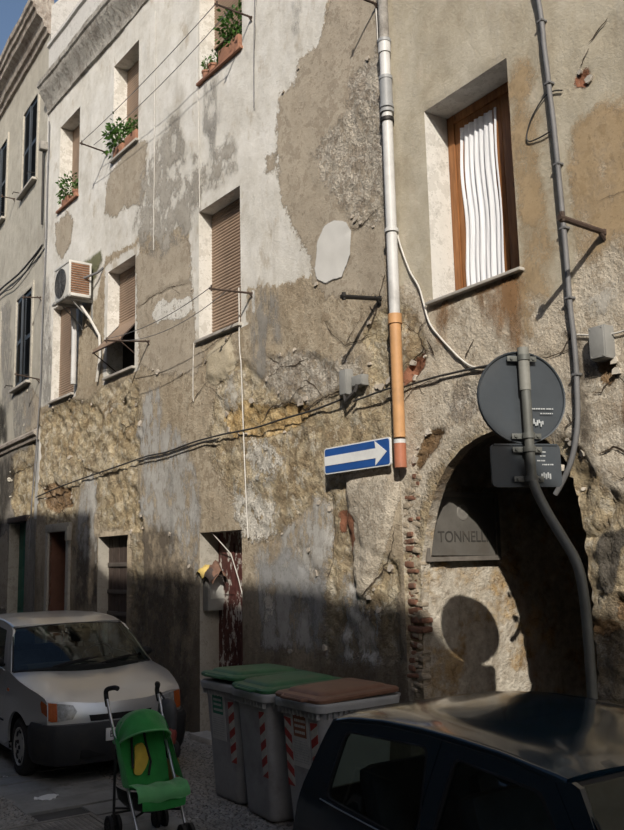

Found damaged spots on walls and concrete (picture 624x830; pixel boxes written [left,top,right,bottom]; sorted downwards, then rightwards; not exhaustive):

flaking render [104,140,148,218]
flaking render [224,0,391,439]
crack [326,274,385,346]
crack [260,356,340,423]
flaking render [403,353,427,385]
peeling [7,388,201,579]
flaking render [340,428,444,693]